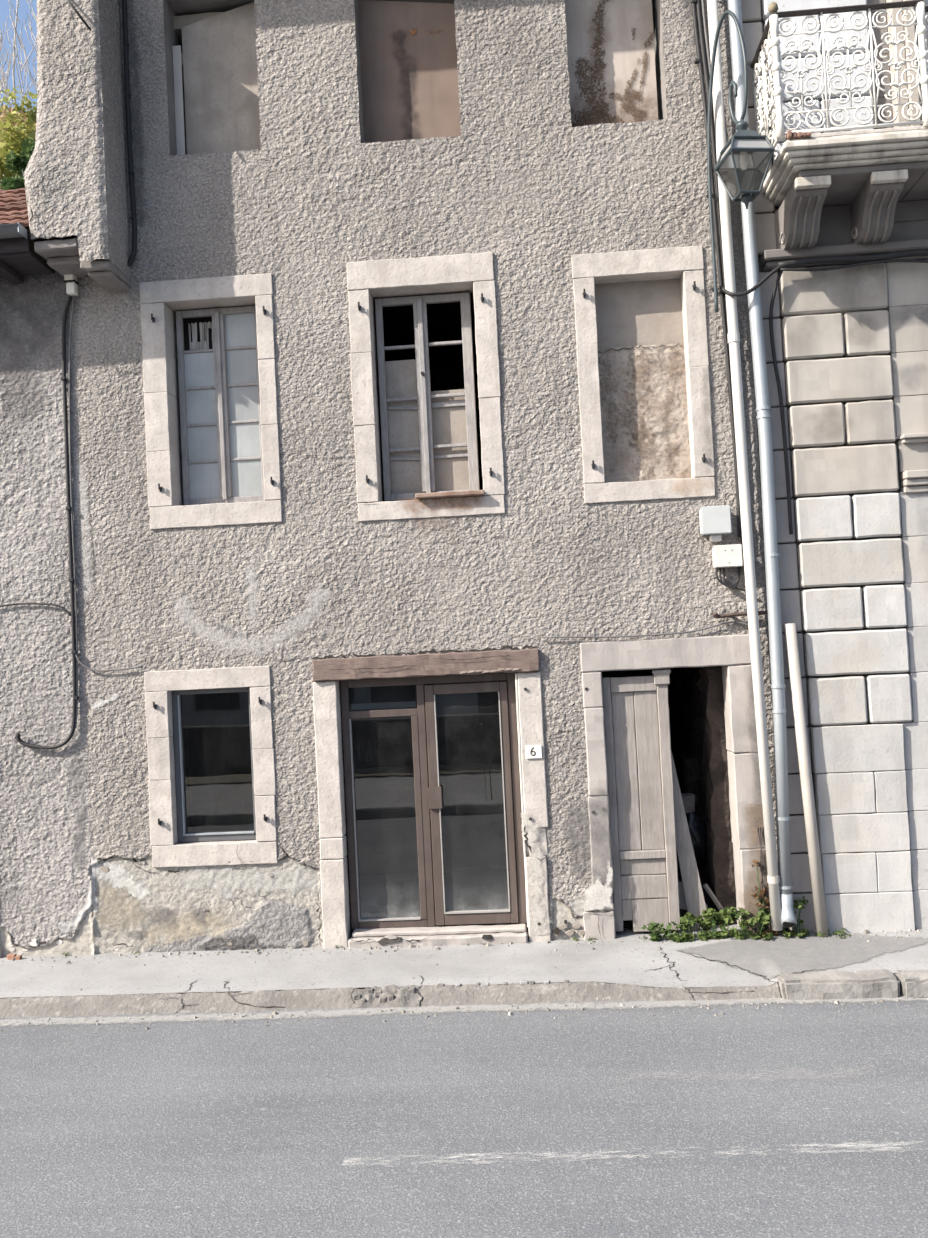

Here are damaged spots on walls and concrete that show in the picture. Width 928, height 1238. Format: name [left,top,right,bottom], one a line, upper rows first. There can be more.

spalling [0,855,324,957]
crack [663,951,774,989]
crack [161,981,284,1014]